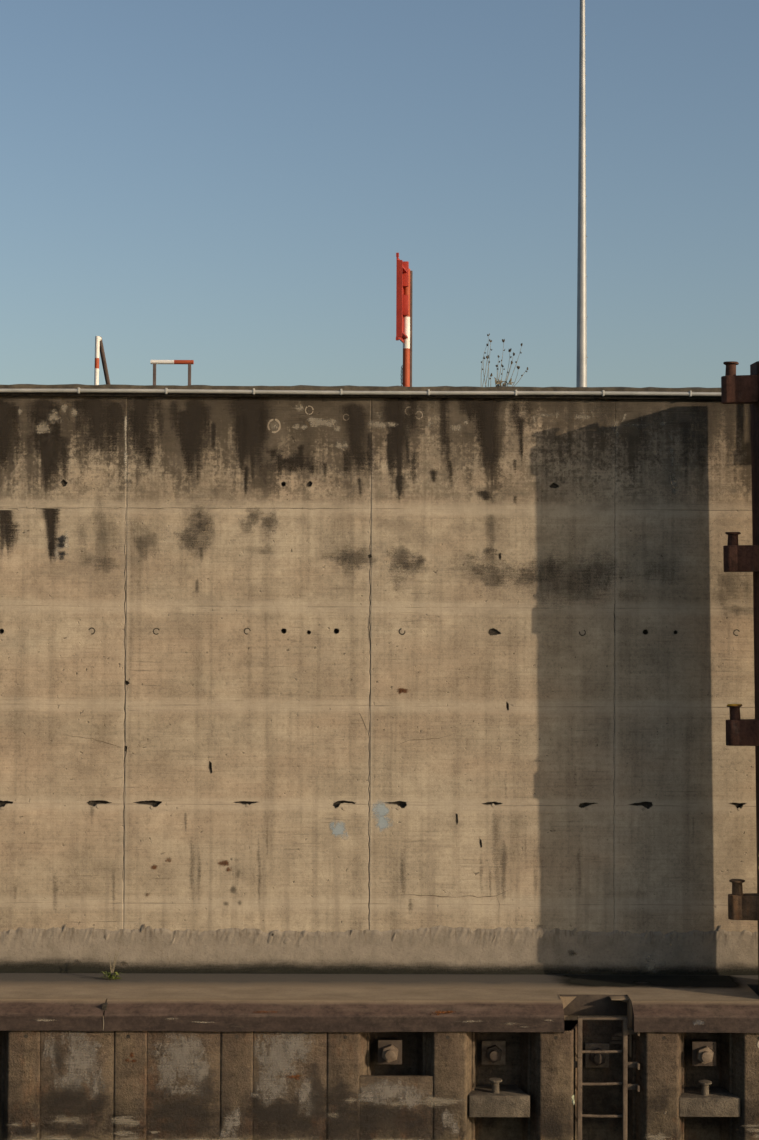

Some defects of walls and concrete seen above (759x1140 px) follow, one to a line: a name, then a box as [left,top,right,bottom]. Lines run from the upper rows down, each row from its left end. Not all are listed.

leakage [0,399,67,484]
leakage [74,398,216,477]
leakage [231,397,326,492]
leakage [344,404,373,494]
leakage [383,398,424,496]
leakage [430,398,529,482]
leakage [0,510,17,547]
leakage [43,508,68,559]